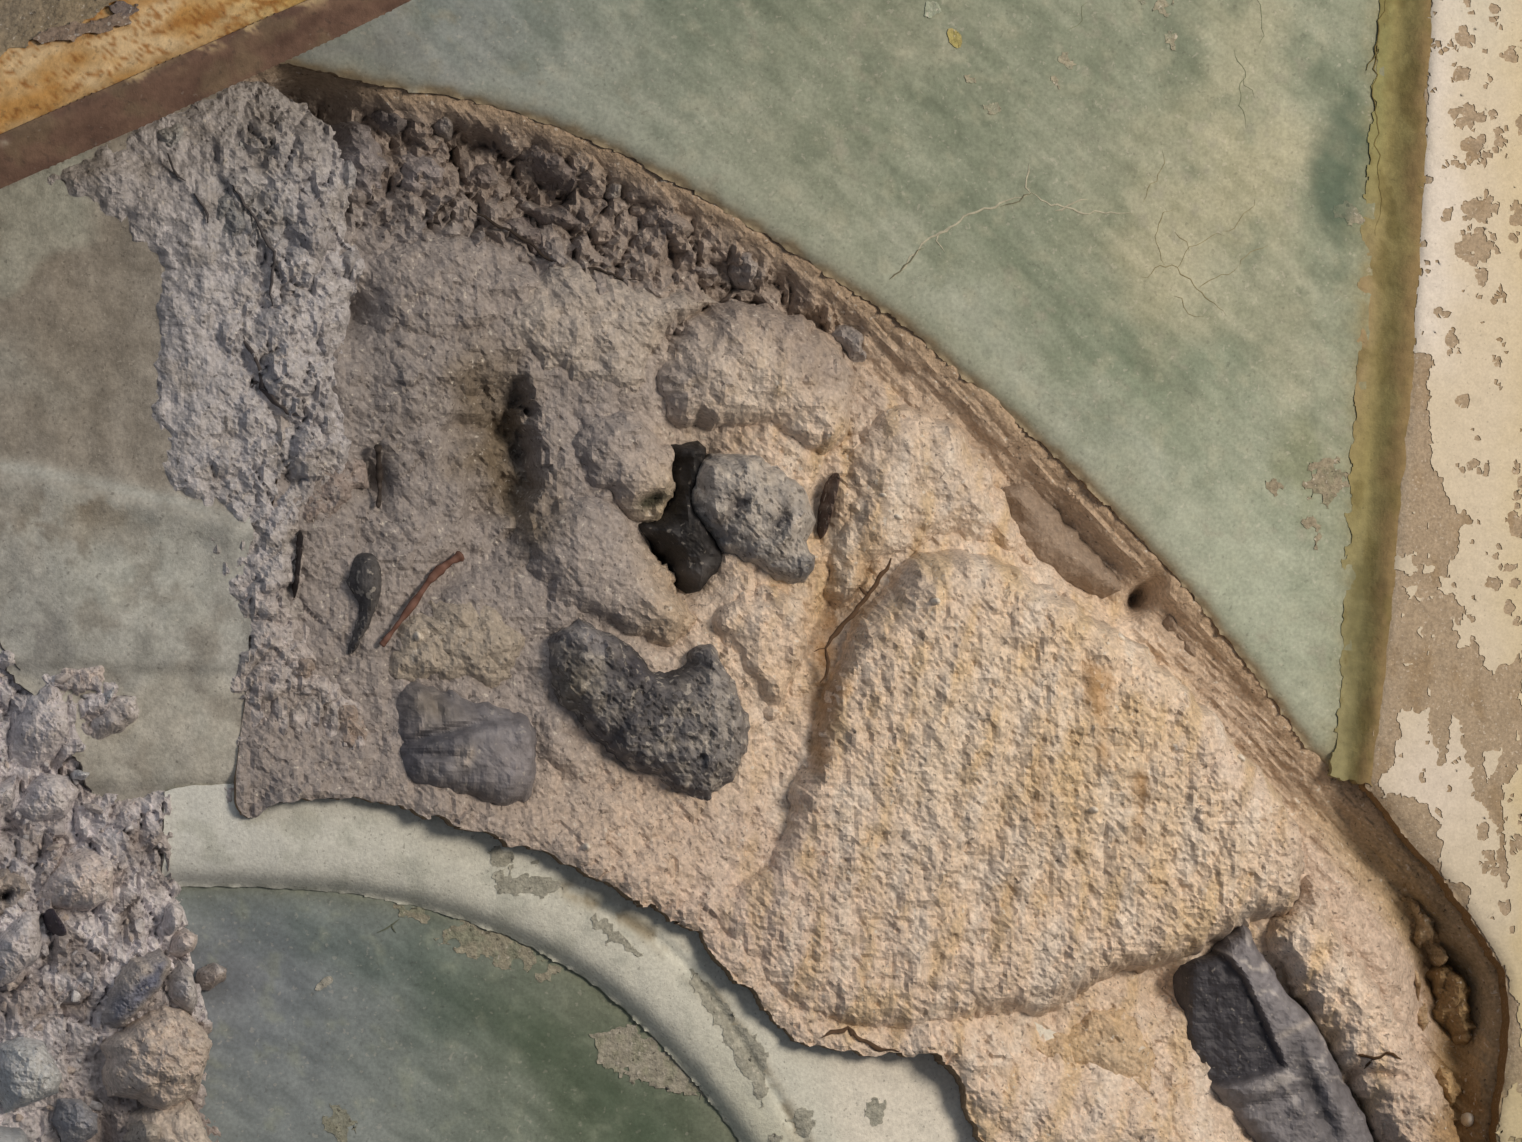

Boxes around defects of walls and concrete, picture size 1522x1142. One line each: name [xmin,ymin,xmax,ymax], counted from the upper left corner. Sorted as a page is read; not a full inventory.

spalling [47,81,369,750]
crack [814,558,892,683]
spalling [224,64,1502,1142]
peeling [1394,0,1522,675]
peeling [1483,748,1508,783]
peeling [1494,1083,1522,1142]